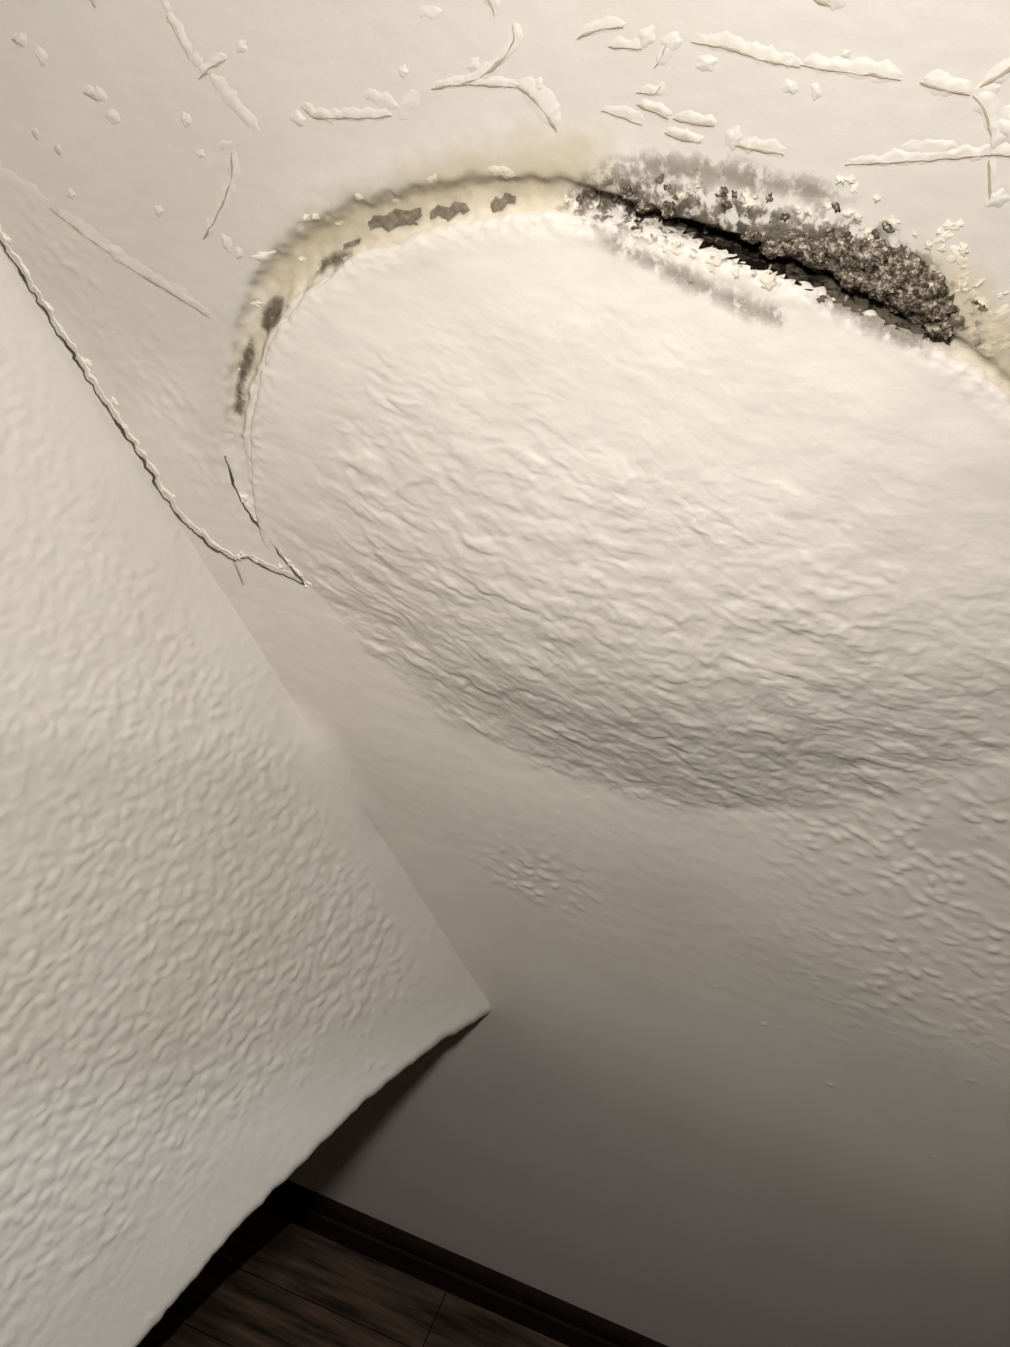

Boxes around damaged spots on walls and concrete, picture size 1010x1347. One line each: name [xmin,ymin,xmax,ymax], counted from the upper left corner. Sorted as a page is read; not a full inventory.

spalling [631,166,722,256]
spalling [741,187,753,205]
spalling [791,174,863,233]
damp [262,298,283,331]
damp [320,253,348,271]
flaking render [226,165,572,438]
spalling [687,254,778,291]
damp [563,172,989,347]
spalling [888,215,1010,359]
crack [0,224,312,588]
damp [235,344,254,413]